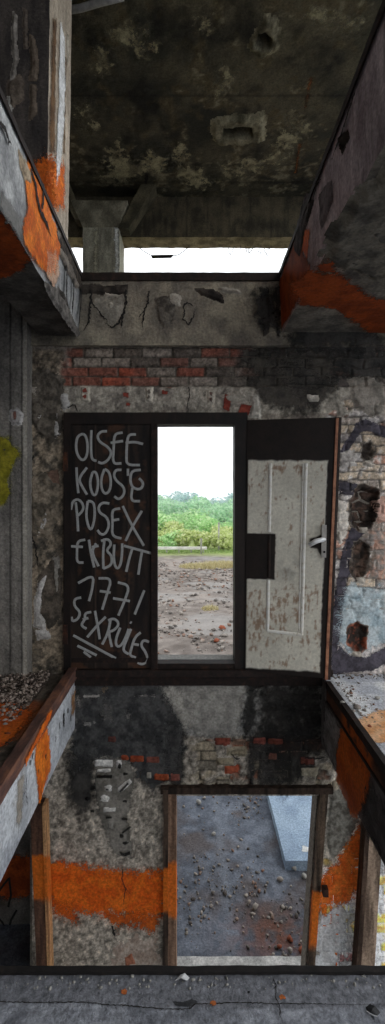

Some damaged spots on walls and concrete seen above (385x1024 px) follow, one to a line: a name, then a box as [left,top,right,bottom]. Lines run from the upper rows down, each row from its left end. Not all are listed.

spalling [247,13,284,59]
spalling [96,108,312,191]
crack [31,169,150,331]
crack [182,302,195,325]
flaking render [333,376,385,418]
flaking render [31,469,61,539]
spalling [337,482,385,584]
flaking render [33,551,62,640]
spalling [346,621,369,657]
leakage [65,749,98,816]
leakage [164,721,188,785]
spalling [214,738,283,774]